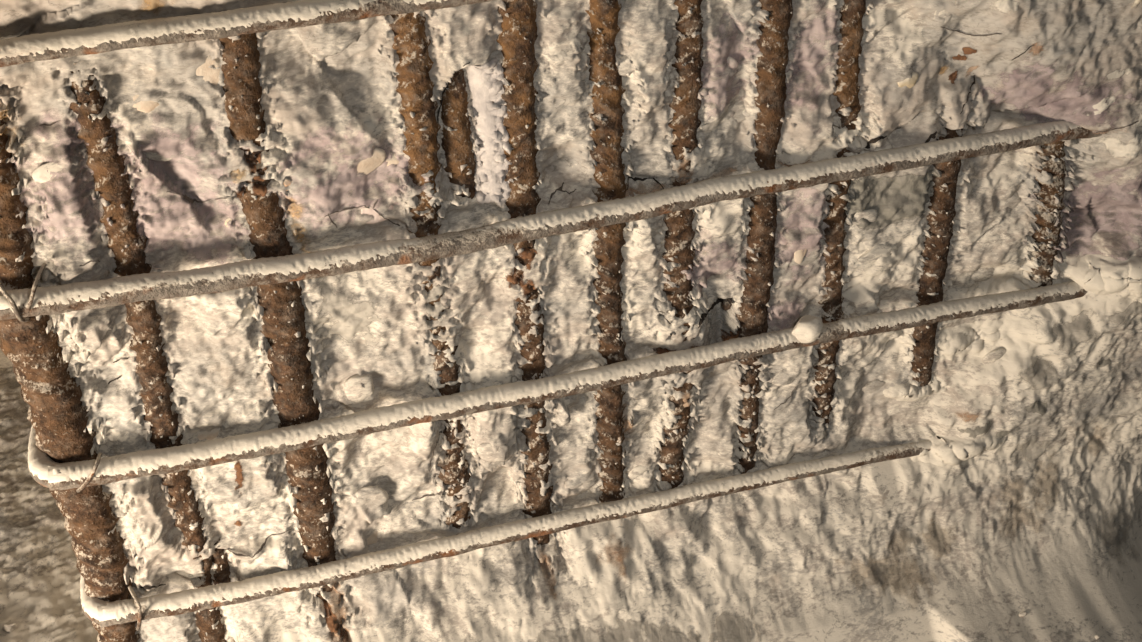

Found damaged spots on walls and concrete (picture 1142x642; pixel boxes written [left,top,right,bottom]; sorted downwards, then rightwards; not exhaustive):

corrosion [939,47,978,84]
corrosion [234,152,268,198]
spalling [0,0,1142,463]
corrosion [506,245,537,298]
corrosion [234,460,243,492]
spalling [49,291,1110,642]
corrosion [323,584,351,642]
water stain [537,608,760,642]